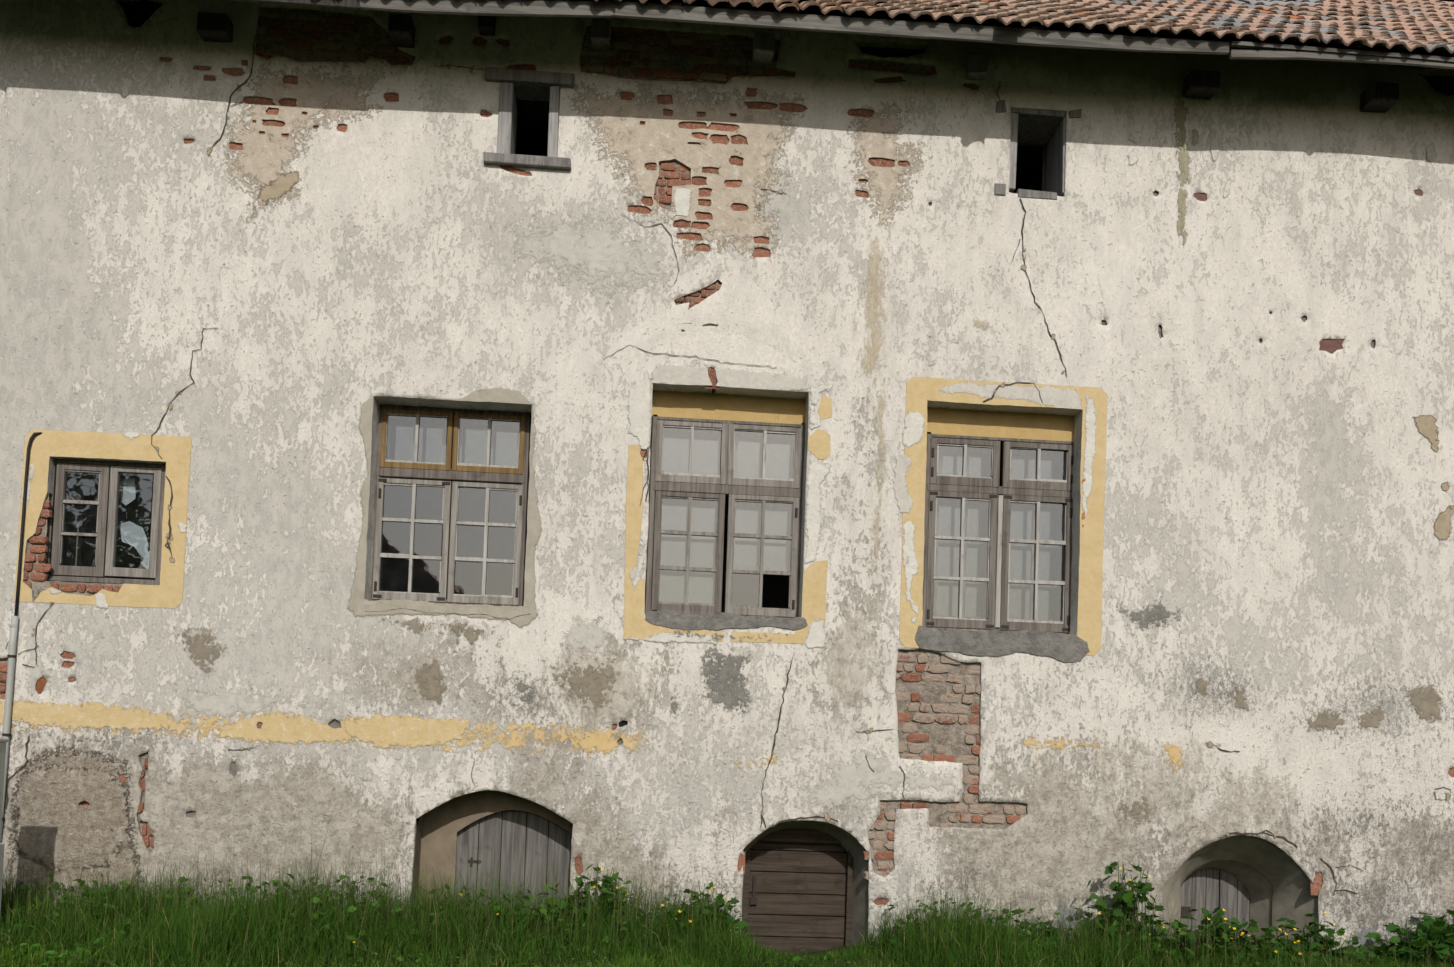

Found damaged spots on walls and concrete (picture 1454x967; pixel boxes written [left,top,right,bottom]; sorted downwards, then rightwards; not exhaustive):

crack [207,35,255,155]
spalling [194,8,416,229]
spalling [505,27,808,310]
spalling [846,101,933,229]
crack [983,198,1067,403]
flaking render [19,464,123,609]
crack [151,328,218,563]
peeling [893,412,925,623]
flaking render [0,658,8,700]
spalling [3,745,154,895]
crack [760,652,838,828]
flaking render [807,649,1027,880]